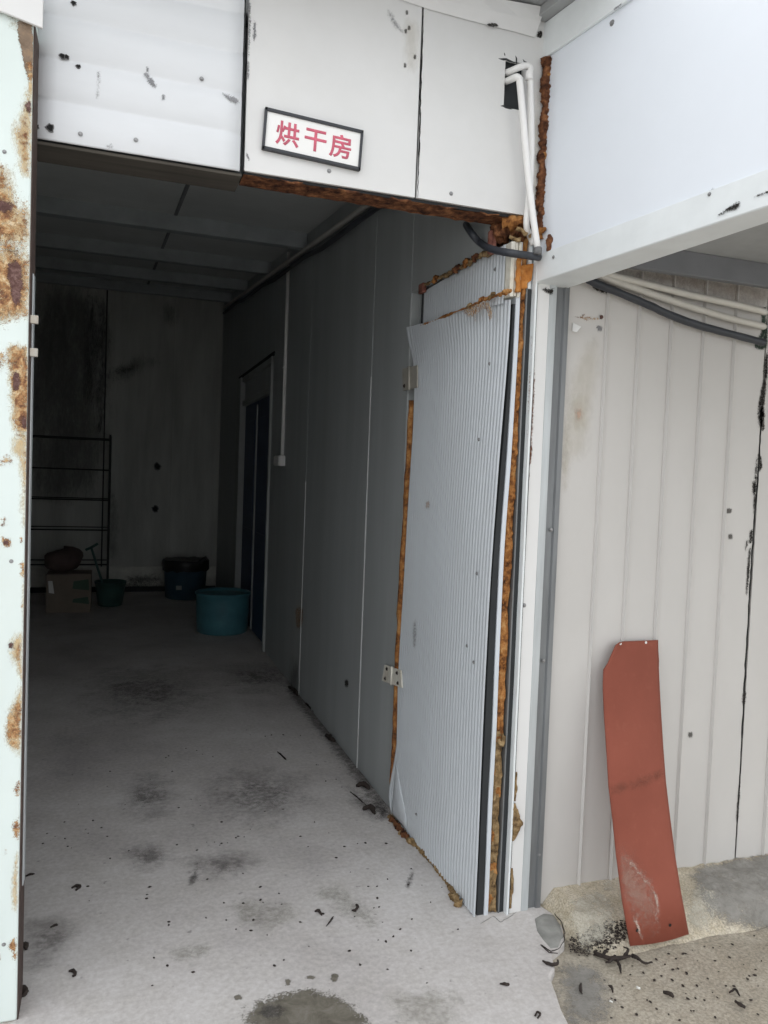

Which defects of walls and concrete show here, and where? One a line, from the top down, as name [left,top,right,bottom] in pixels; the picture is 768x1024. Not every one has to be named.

corrosion [0,81,32,324]
corrosion [239,174,508,225]
corrosion [6,638,22,749]
water stain [234,976,369,1024]